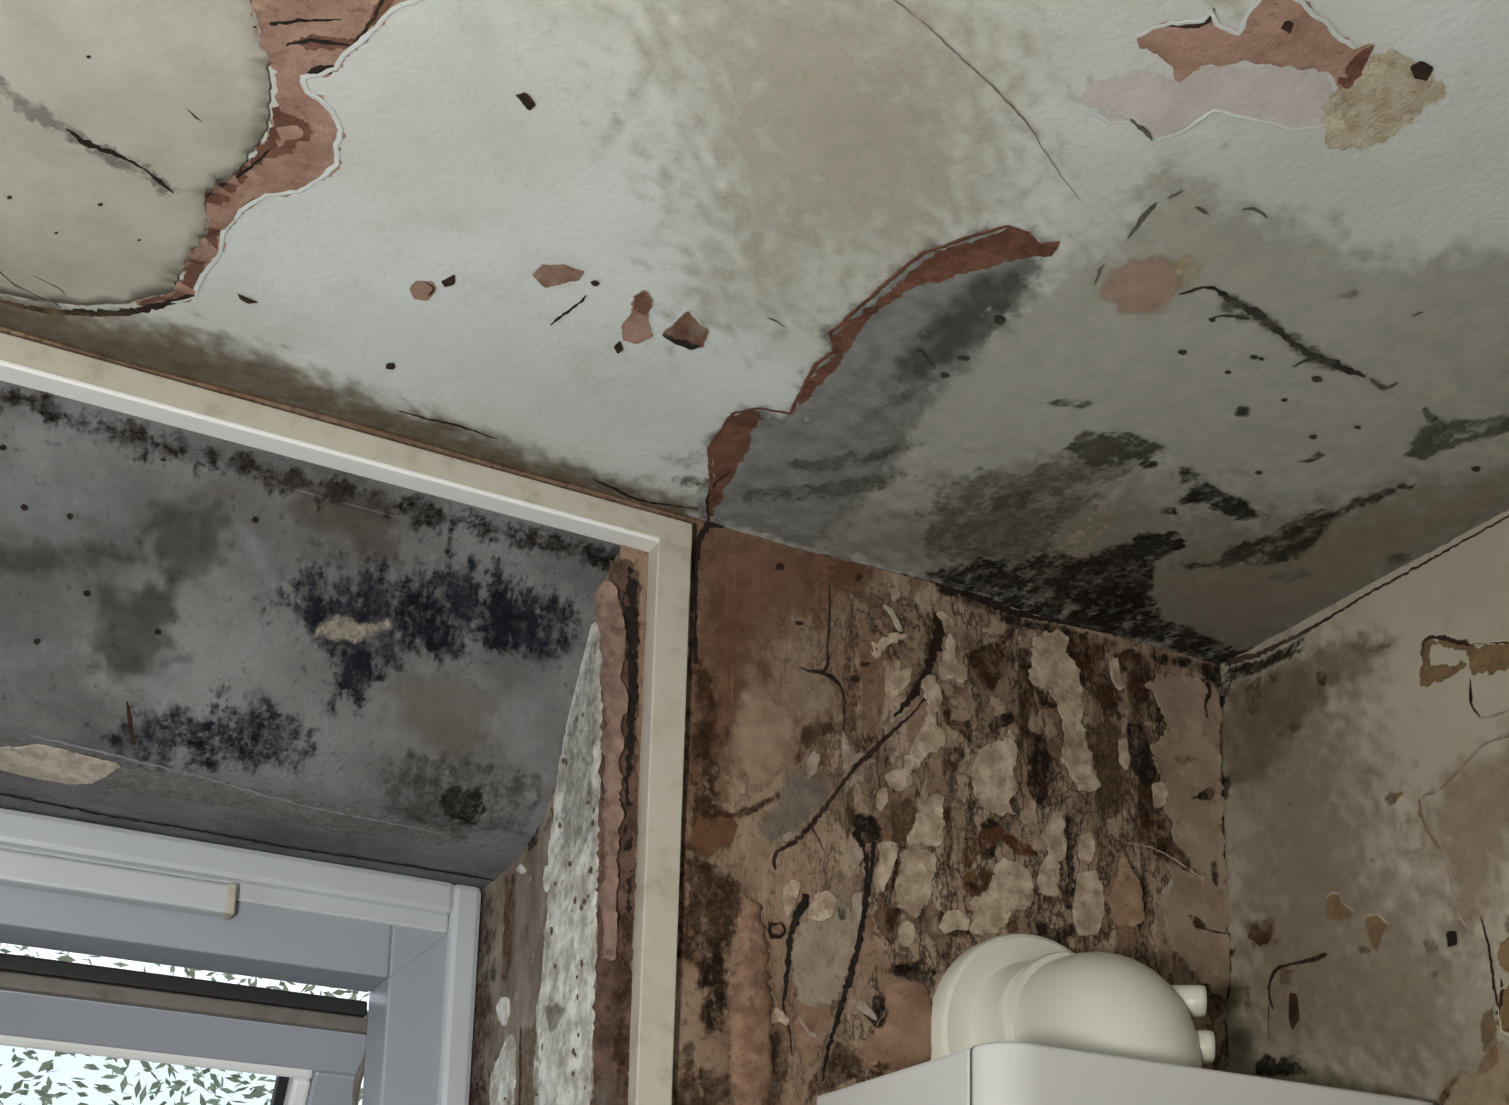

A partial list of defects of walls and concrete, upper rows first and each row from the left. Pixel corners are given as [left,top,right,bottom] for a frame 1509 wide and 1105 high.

crack [0,77,173,194]
flaking render [135,0,422,307]
peeling [1079,0,1446,151]
leakage [110,686,316,772]
leakage [1,389,618,712]
leakage [0,296,708,518]
leakage [469,875,515,1105]
peeling [489,559,642,1105]
peeling [782,793,945,1065]
flaking render [701,225,1060,544]
peeling [938,657,1278,999]
leakage [792,177,1509,1079]